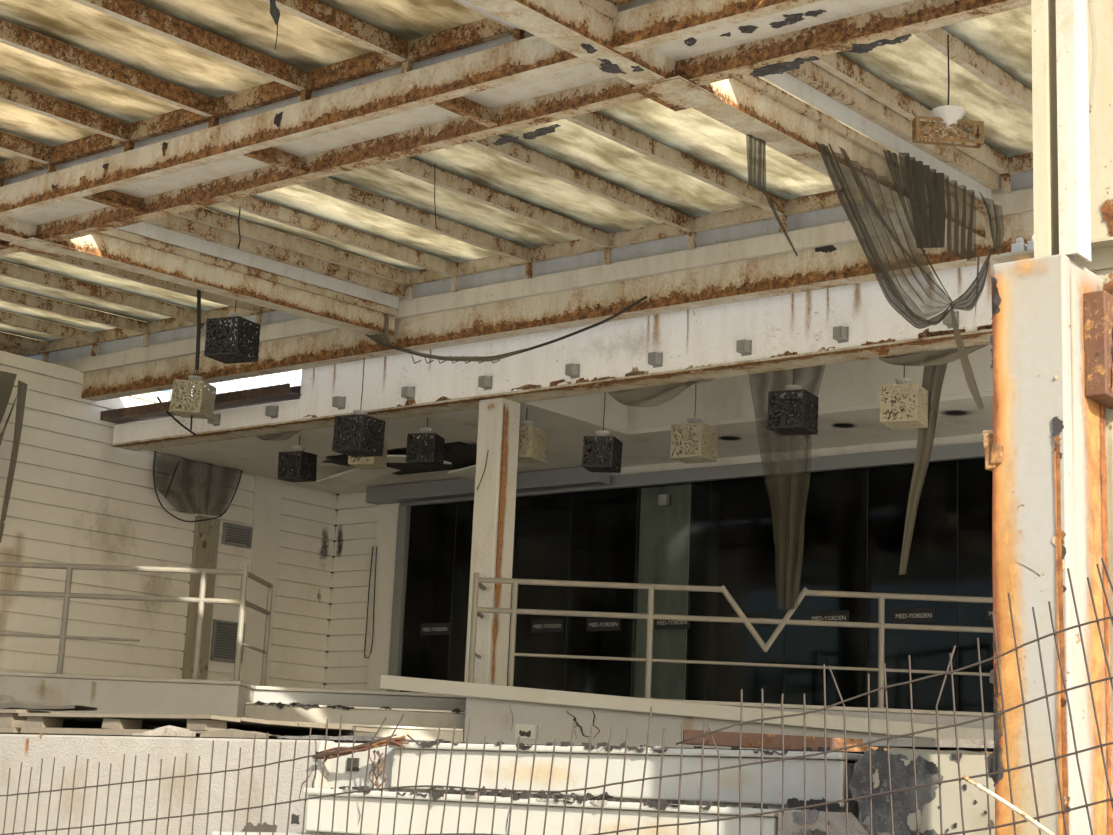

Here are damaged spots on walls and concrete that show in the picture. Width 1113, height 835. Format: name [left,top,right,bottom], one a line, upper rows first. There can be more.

peeling [581,43,644,74]
corrosion [1101,199,1113,237]
corrosion [815,245,837,253]
corrosion [1082,277,1113,835]
corrosion [1052,416,1070,835]
spalling [398,786,614,807]
spalling [643,799,678,811]
spalling [786,798,840,835]
flaking render [849,747,944,835]